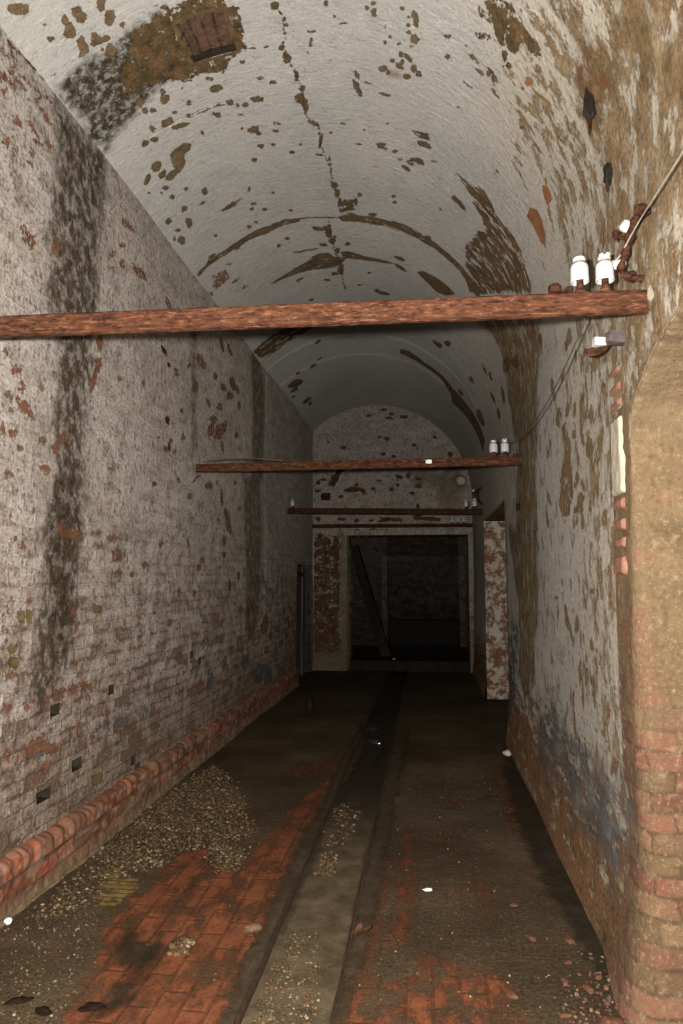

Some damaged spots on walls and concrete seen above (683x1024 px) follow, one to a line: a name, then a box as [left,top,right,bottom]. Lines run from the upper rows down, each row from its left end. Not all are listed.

peeling [7,3,29,15]
water stain [49,15,171,314]
peeling [144,142,208,245]
flaking render [42,0,346,162]
crack [197,5,477,293]
peeling [365,1,422,79]
spalling [527,177,552,247]
water stain [562,3,612,127]
water stain [618,0,683,99]
water stain [33,335,92,709]
peeling [545,365,628,575]
water stain [504,756,611,987]